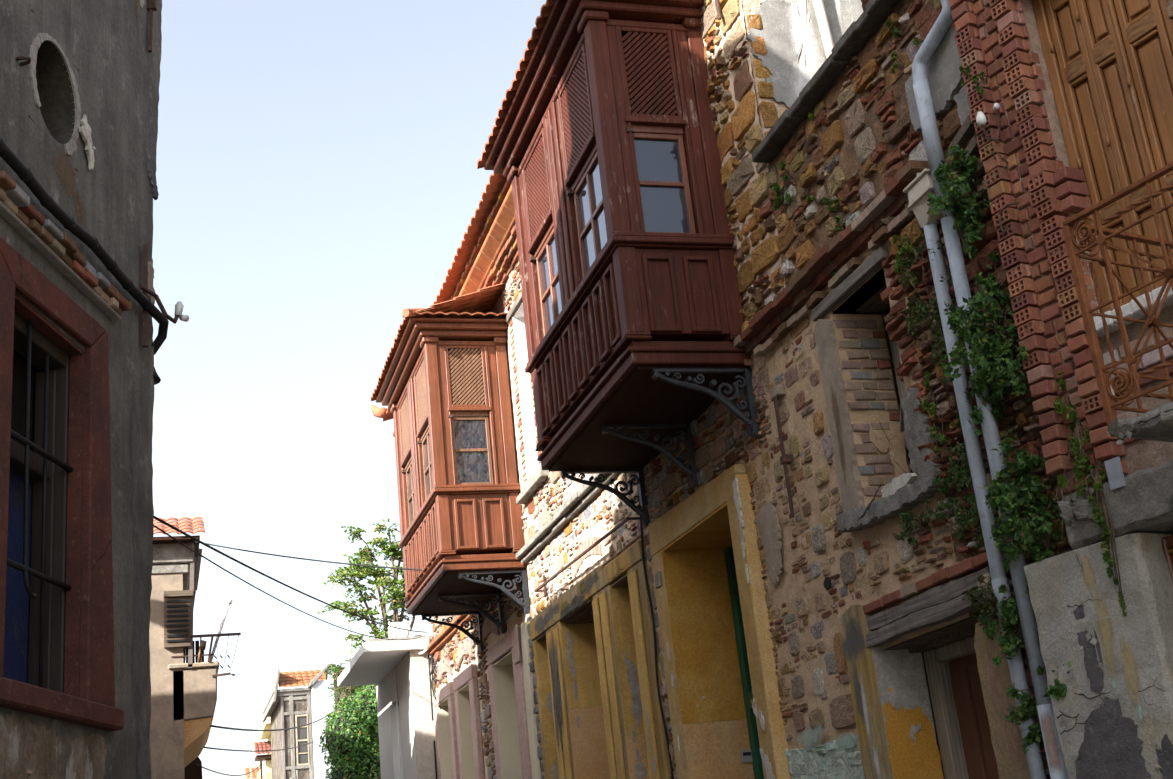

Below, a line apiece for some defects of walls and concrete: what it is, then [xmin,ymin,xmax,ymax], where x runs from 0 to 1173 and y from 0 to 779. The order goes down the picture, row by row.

flaking render [1073,605,1173,779]